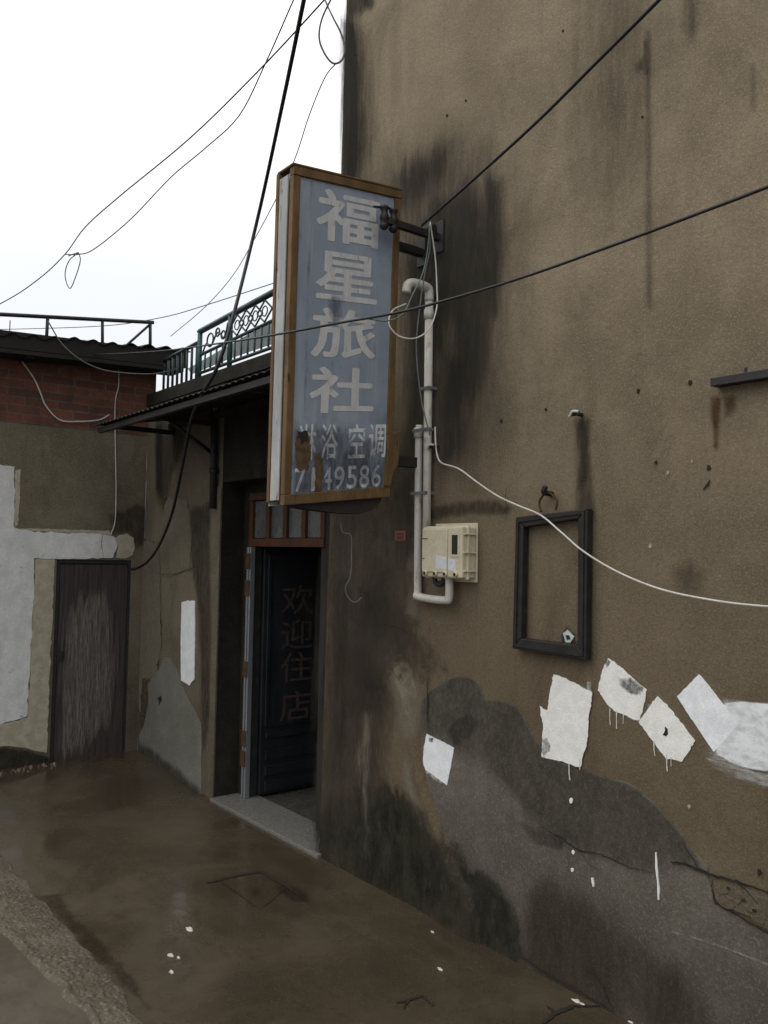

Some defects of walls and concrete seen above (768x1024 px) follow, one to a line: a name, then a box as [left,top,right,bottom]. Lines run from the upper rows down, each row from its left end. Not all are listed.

leakage [577,420,592,510]
corrosion [712,397,733,447]
leakage [313,151,521,961]
crack [542,827,768,934]
spalling [713,881,768,930]